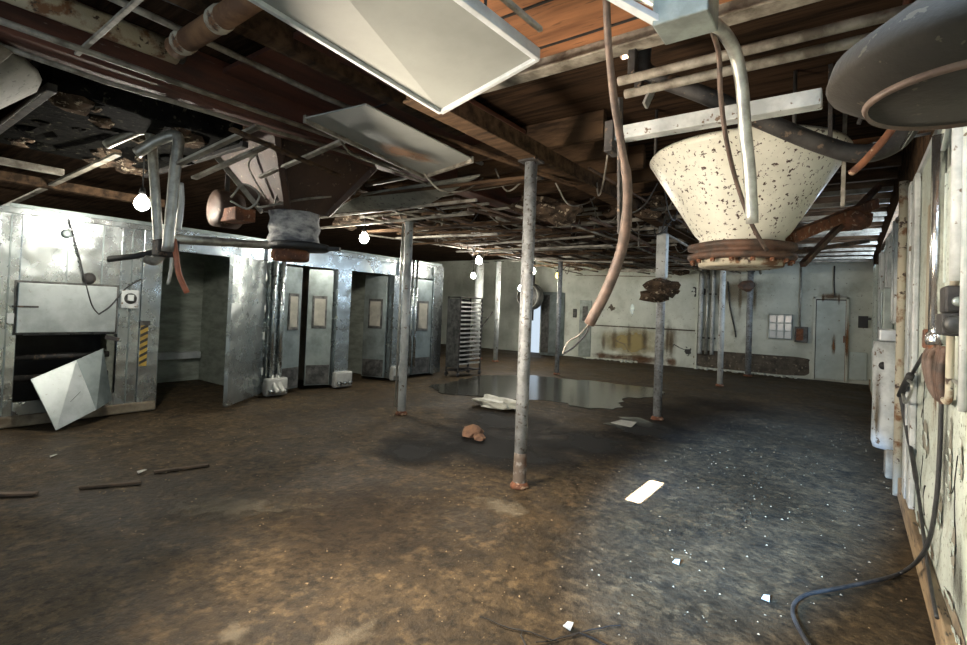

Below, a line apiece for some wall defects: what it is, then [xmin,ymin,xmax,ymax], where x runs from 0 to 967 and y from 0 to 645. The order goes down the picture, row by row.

damp [602,332,650,354]
damp [666,330,674,351]
peeling [915,416,963,577]
spalling [941,586,965,645]